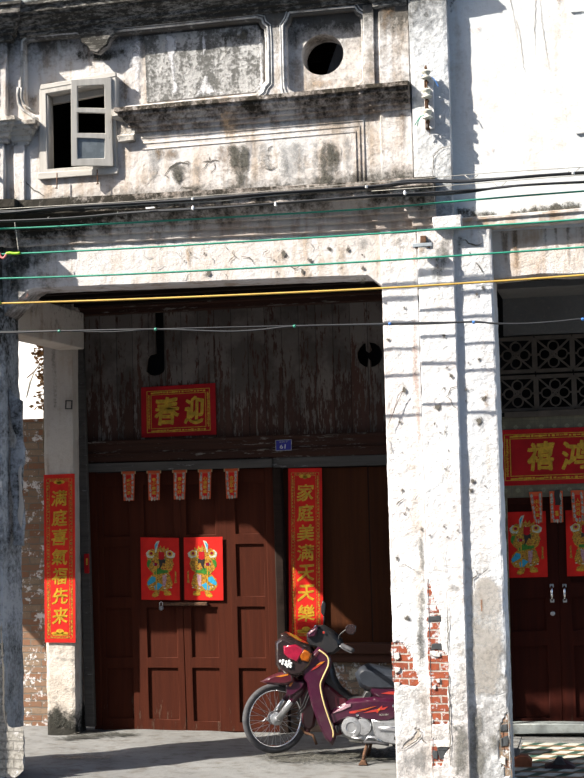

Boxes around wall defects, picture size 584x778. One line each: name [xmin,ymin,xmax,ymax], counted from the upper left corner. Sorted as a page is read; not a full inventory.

leakage [166,35,177,92]
leakage [197,76,216,95]
crack [510,0,550,73]
leakage [319,141,347,184]
spalling [391,642,419,686]
spalling [426,579,460,729]
spalling [0,644,24,778]
spalling [431,739,450,766]